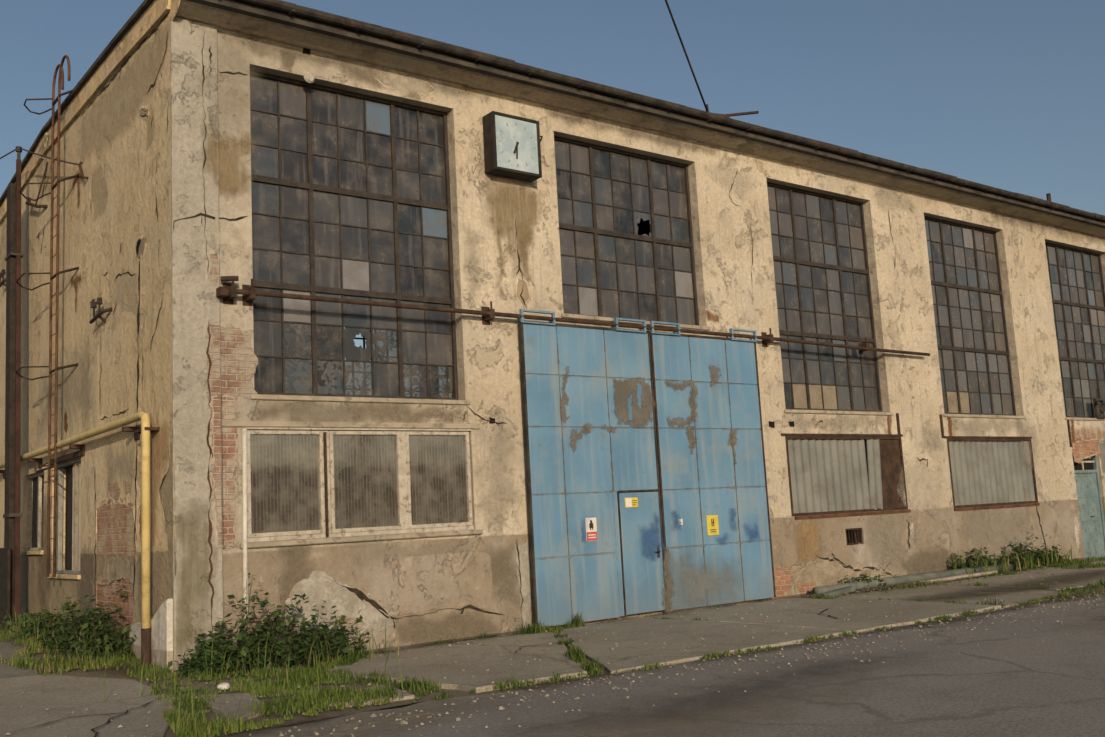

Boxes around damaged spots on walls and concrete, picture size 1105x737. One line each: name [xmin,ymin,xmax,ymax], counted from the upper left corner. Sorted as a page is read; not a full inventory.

crack [81,12,170,126]
crack [90,24,247,632]
flaking render [207,324,258,549]
corrosion [560,370,591,451]
corrosion [604,378,655,432]
corrosion [665,380,698,454]
corrosion [709,366,720,386]
flaking render [1072,437,1105,474]
flaking render [95,575,135,632]
flaking render [96,480,141,560]
crack [323,544,524,628]
crack [815,520,911,593]